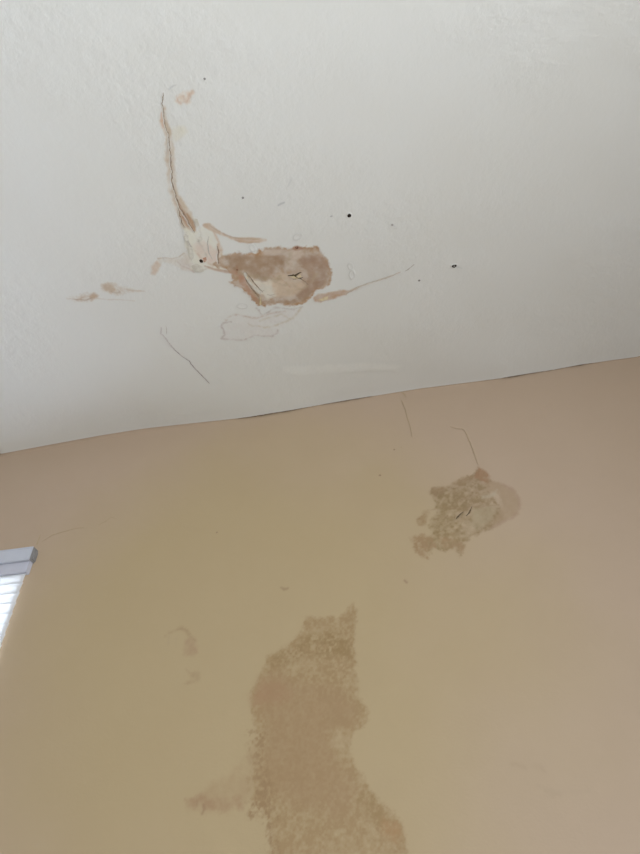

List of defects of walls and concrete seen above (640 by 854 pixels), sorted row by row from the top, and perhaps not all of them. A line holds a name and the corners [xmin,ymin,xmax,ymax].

crack [157,93,197,233]
leakage [65,280,147,303]
peeling [183,218,224,273]
leakage [149,222,334,342]
crack [159,326,210,384]
leakage [407,465,523,561]
leakage [182,601,412,854]